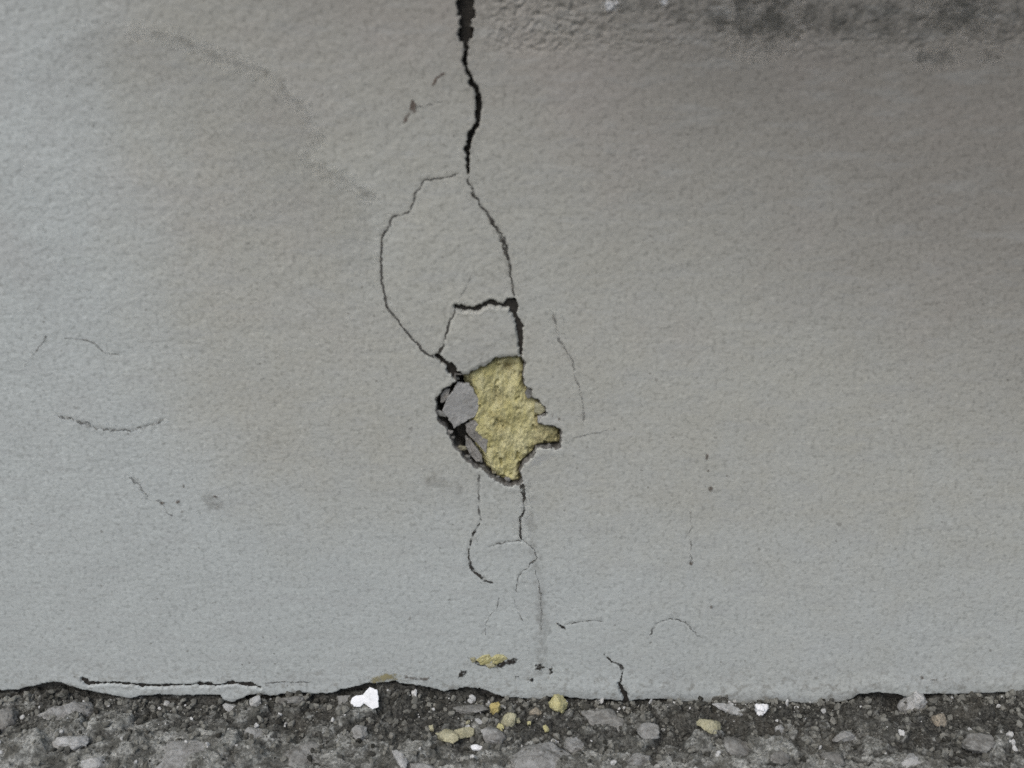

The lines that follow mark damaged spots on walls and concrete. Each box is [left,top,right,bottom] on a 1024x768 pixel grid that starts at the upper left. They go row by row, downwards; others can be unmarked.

crack [380,0,524,376]
spalling [435,355,562,487]
crack [468,475,541,633]
crack [607,657,629,701]